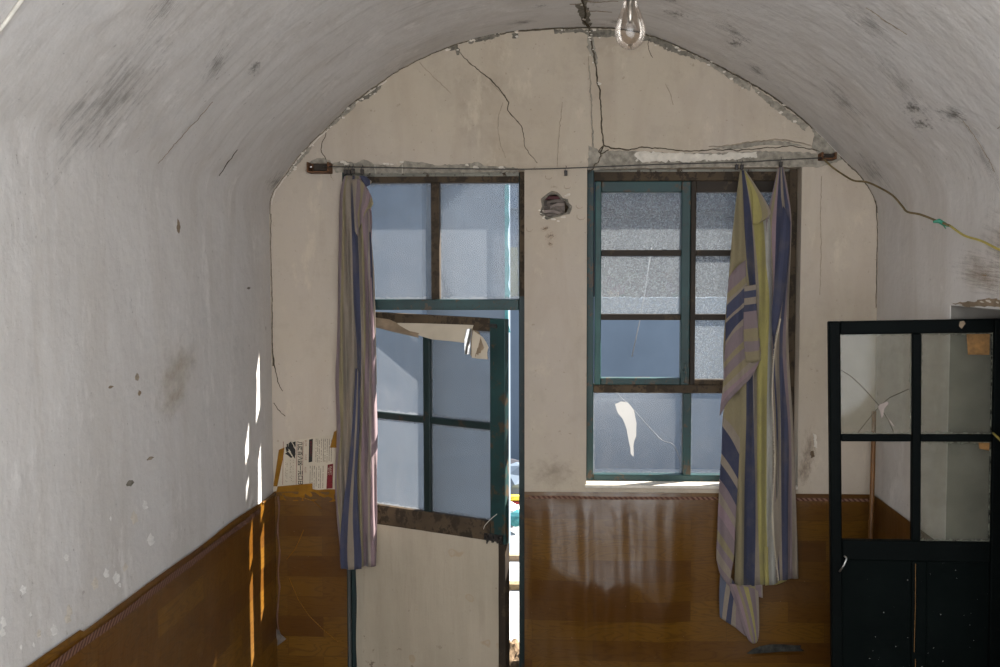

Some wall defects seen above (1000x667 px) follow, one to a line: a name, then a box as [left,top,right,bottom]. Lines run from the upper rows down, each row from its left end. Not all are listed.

flaking render [587,34,848,170]
spalling [538,187,584,222]
crack [270,0,878,416]